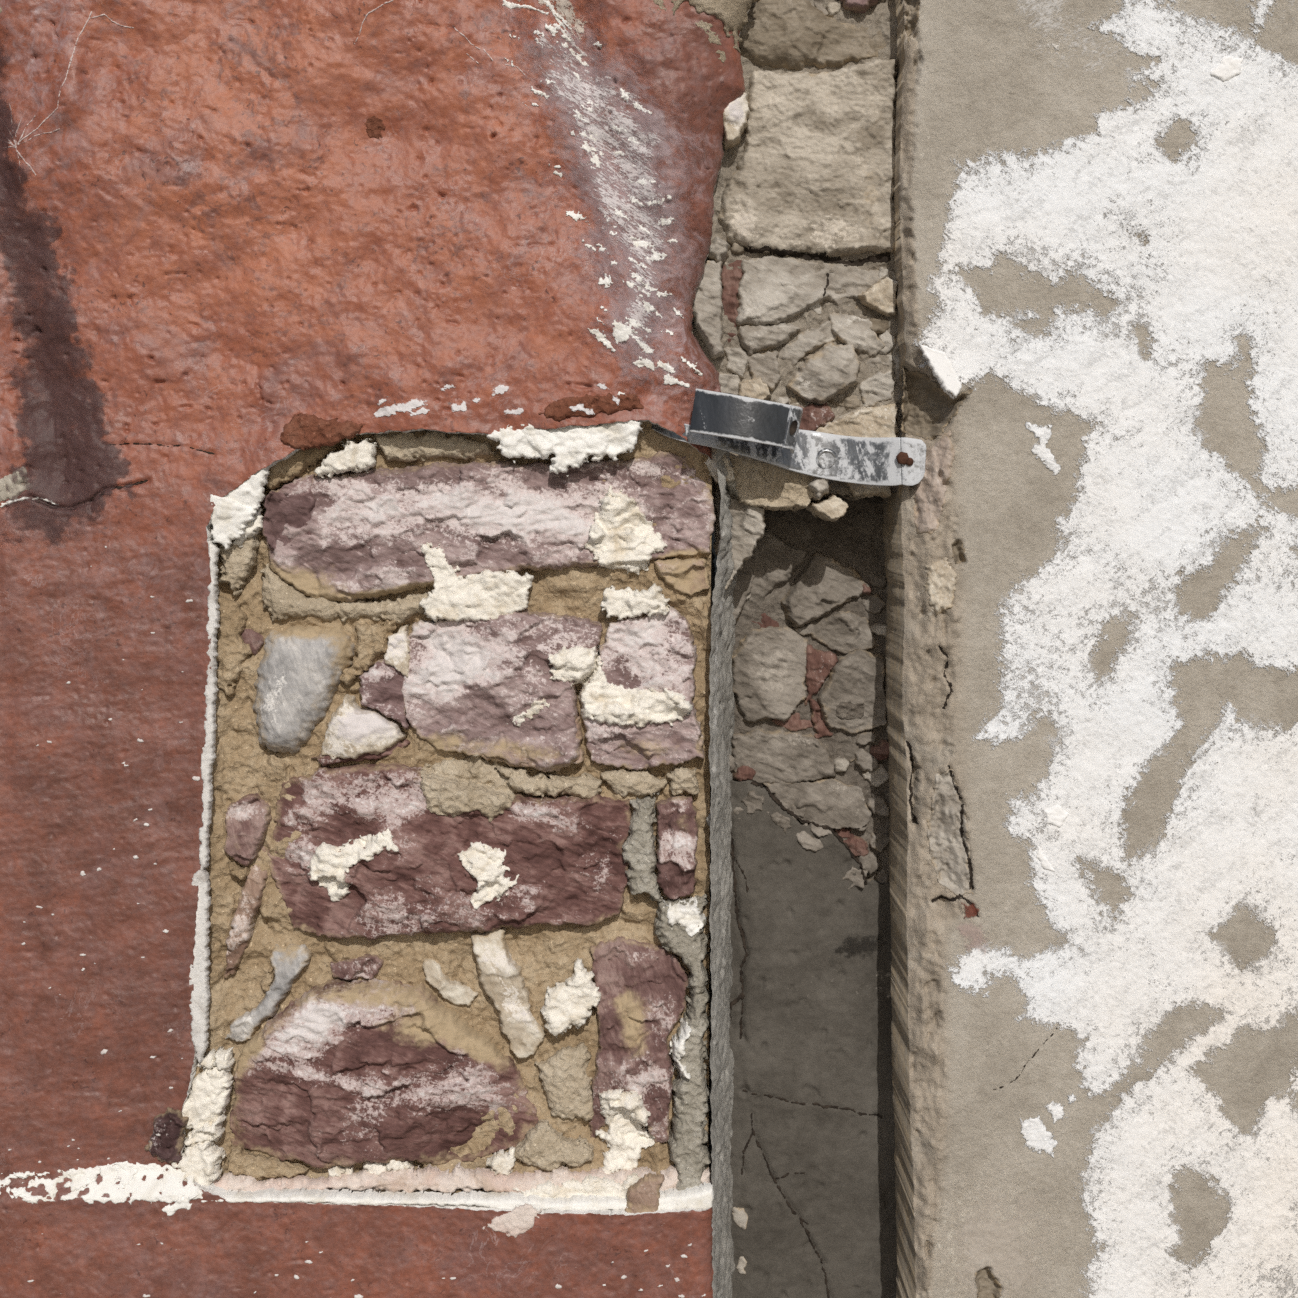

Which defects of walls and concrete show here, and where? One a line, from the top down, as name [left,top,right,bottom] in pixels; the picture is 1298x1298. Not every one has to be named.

peeling [653,0,756,66]
efflorescence [509,13,703,388]
leakage [0,100,131,542]
crack [939,645,954,709]
spalling [0,393,735,1219]
crack [751,780,868,884]
crack [906,741,918,824]
crack [931,765,979,917]
crack [741,1089,883,1298]